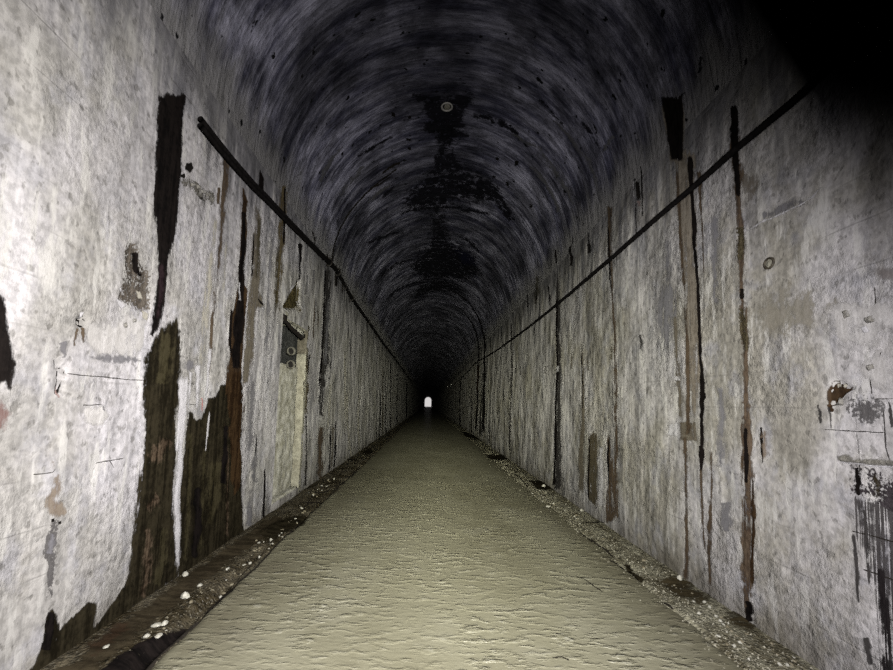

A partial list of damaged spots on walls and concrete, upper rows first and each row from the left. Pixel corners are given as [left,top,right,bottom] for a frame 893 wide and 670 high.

peeling [53,242,151,397]
water stain [30,92,309,670]
water stain [655,96,732,605]
rust [730,106,766,621]
water stain [846,380,893,461]
water stain [850,446,893,670]